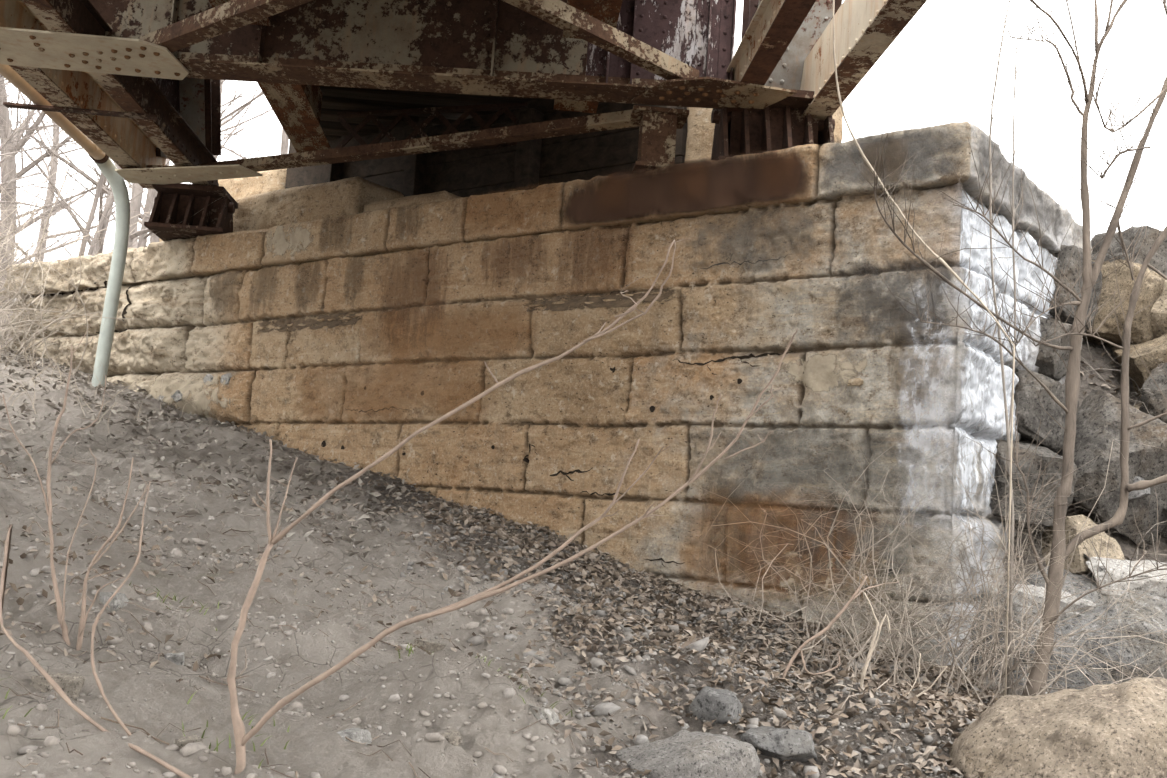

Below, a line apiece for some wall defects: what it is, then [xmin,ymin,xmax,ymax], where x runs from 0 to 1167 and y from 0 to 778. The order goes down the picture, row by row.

corrosion [566,151,804,223]
crack [674,351,796,375]